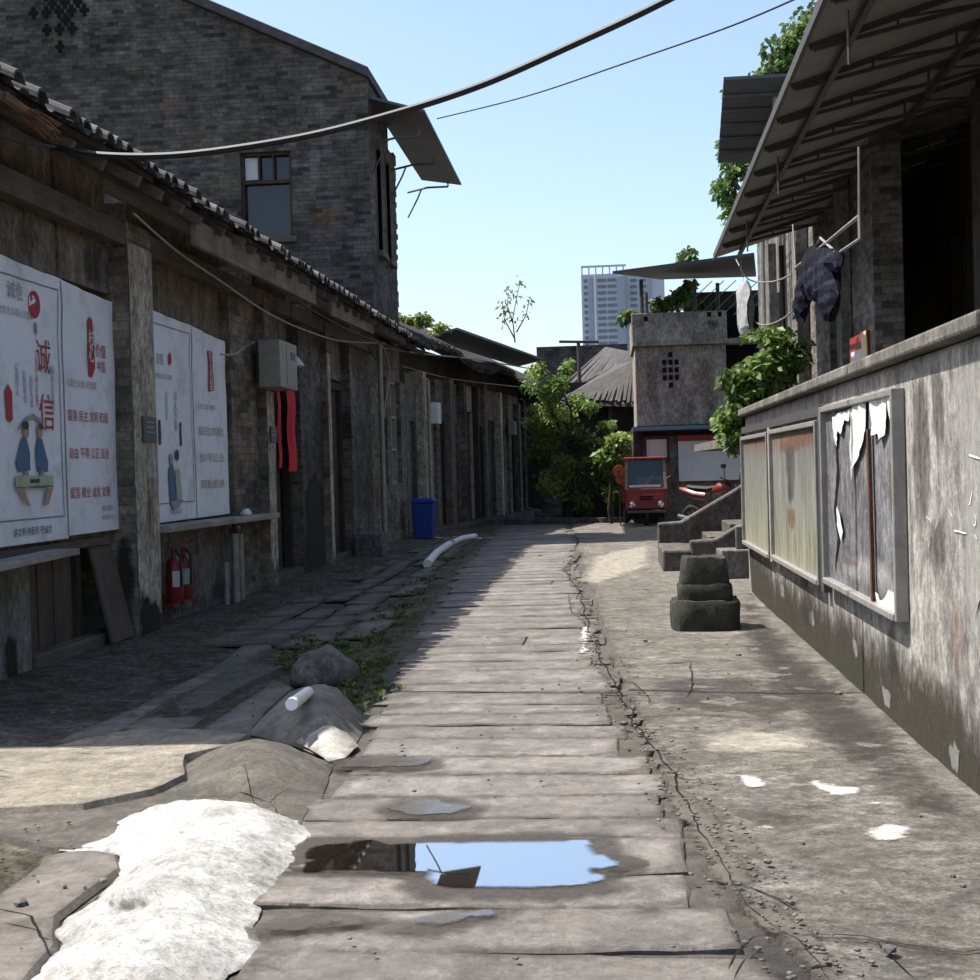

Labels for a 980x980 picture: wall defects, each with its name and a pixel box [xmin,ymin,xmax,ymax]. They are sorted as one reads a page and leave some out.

corrosion [866,429,876,601]
leakage [914,377,943,509]
crack [561,552,980,980]
leakage [662,548,980,815]